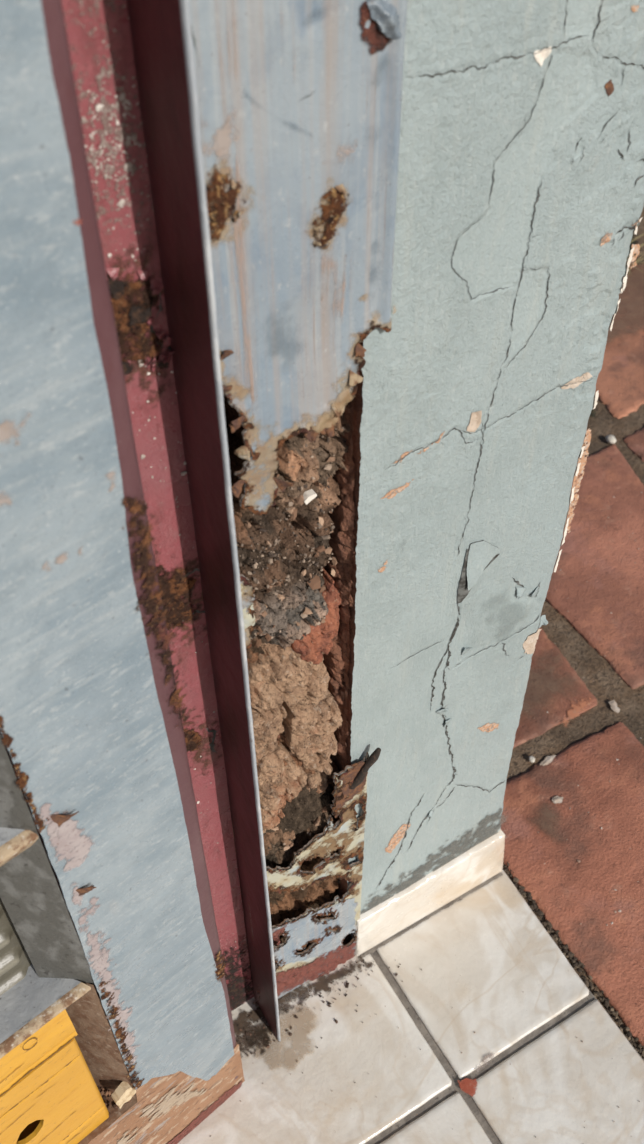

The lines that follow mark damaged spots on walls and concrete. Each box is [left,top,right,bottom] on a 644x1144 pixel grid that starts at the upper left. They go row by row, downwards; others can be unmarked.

corrosion [105,248,175,402]
corrosion [203,116,396,515]
crack [387,0,644,555]
peeling [39,803,138,1065]
corrosion [106,472,222,775]
corrosion [215,945,260,1011]
corrosion [240,575,256,651]
spalling [223,393,355,946]
corrosion [266,748,381,996]
crack [378,605,541,886]